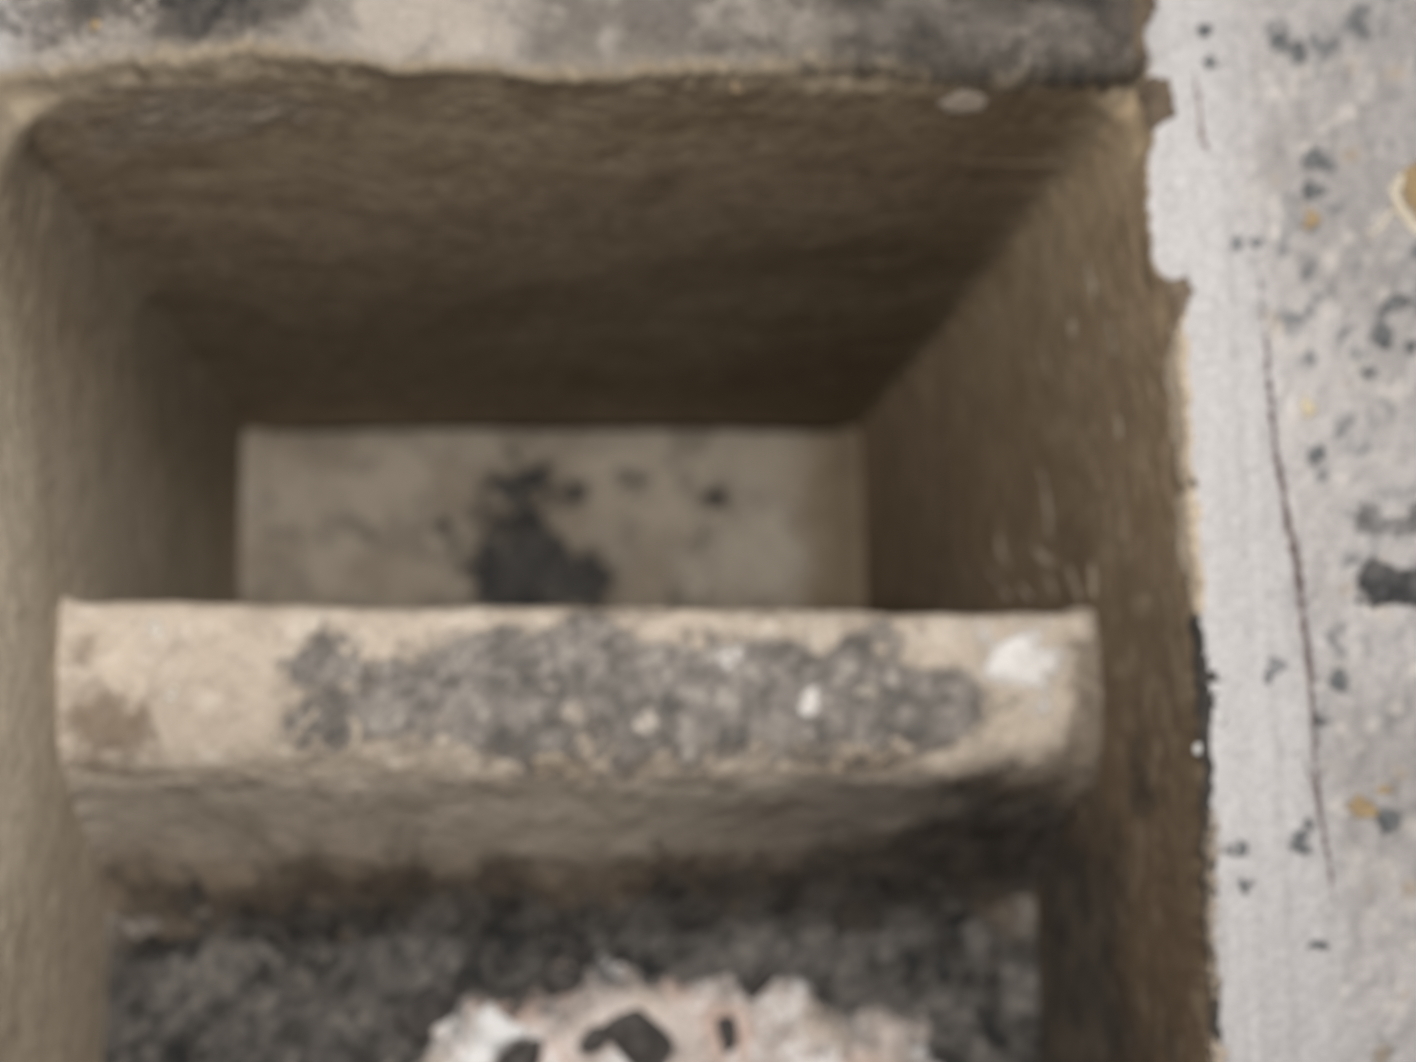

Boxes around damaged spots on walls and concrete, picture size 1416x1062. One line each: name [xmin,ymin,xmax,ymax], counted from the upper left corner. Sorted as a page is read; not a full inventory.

spalling [278,608,988,780]